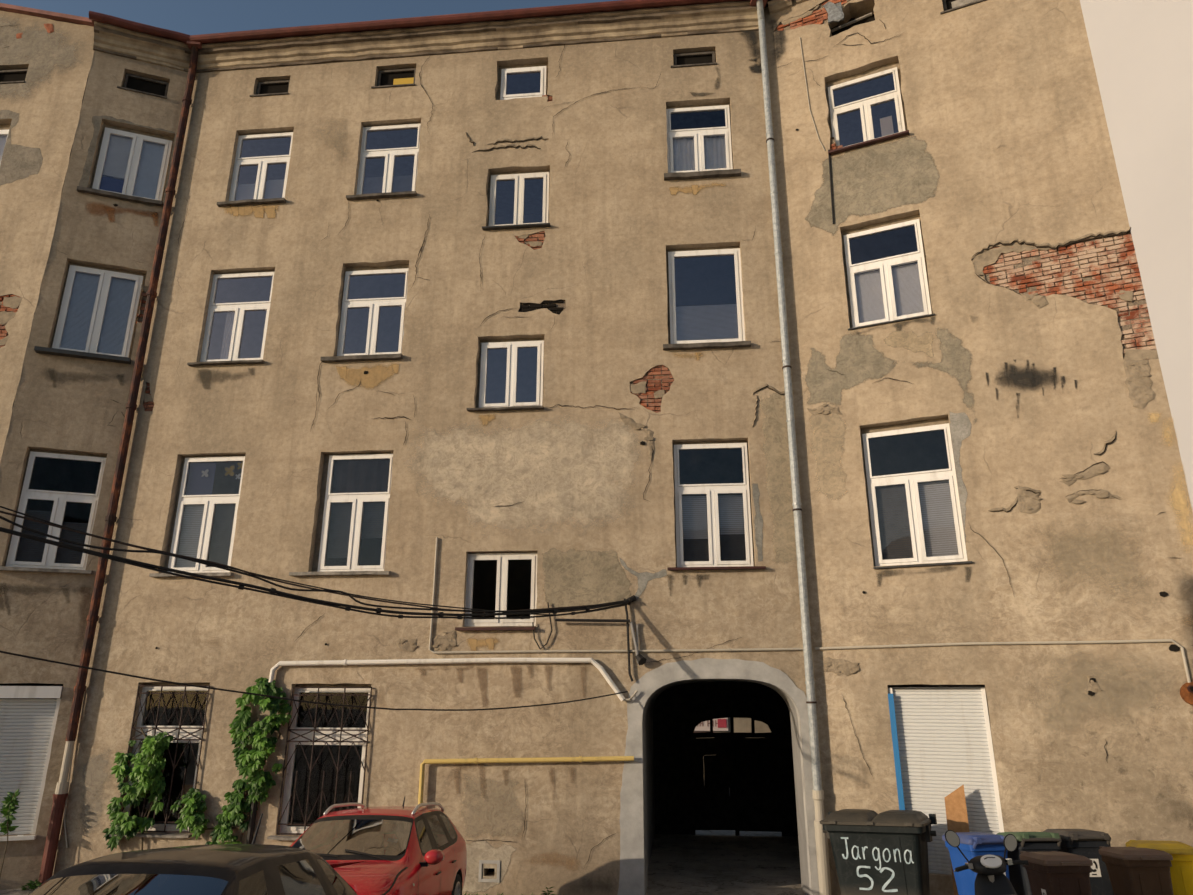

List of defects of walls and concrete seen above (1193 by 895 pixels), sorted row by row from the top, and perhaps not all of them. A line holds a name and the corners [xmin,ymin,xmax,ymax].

flaking render [776,0,850,31]
crack [466,44,661,166]
flaking render [515,231,545,250]
flaking render [0,294,22,348]
flaking render [518,300,566,314]
flaking render [972,230,1159,409]
flaking render [630,365,674,413]
water stain [1005,360,1077,395]
flaking render [619,413,655,462]
flaking render [1015,487,1041,514]
flaking render [1059,462,1121,504]